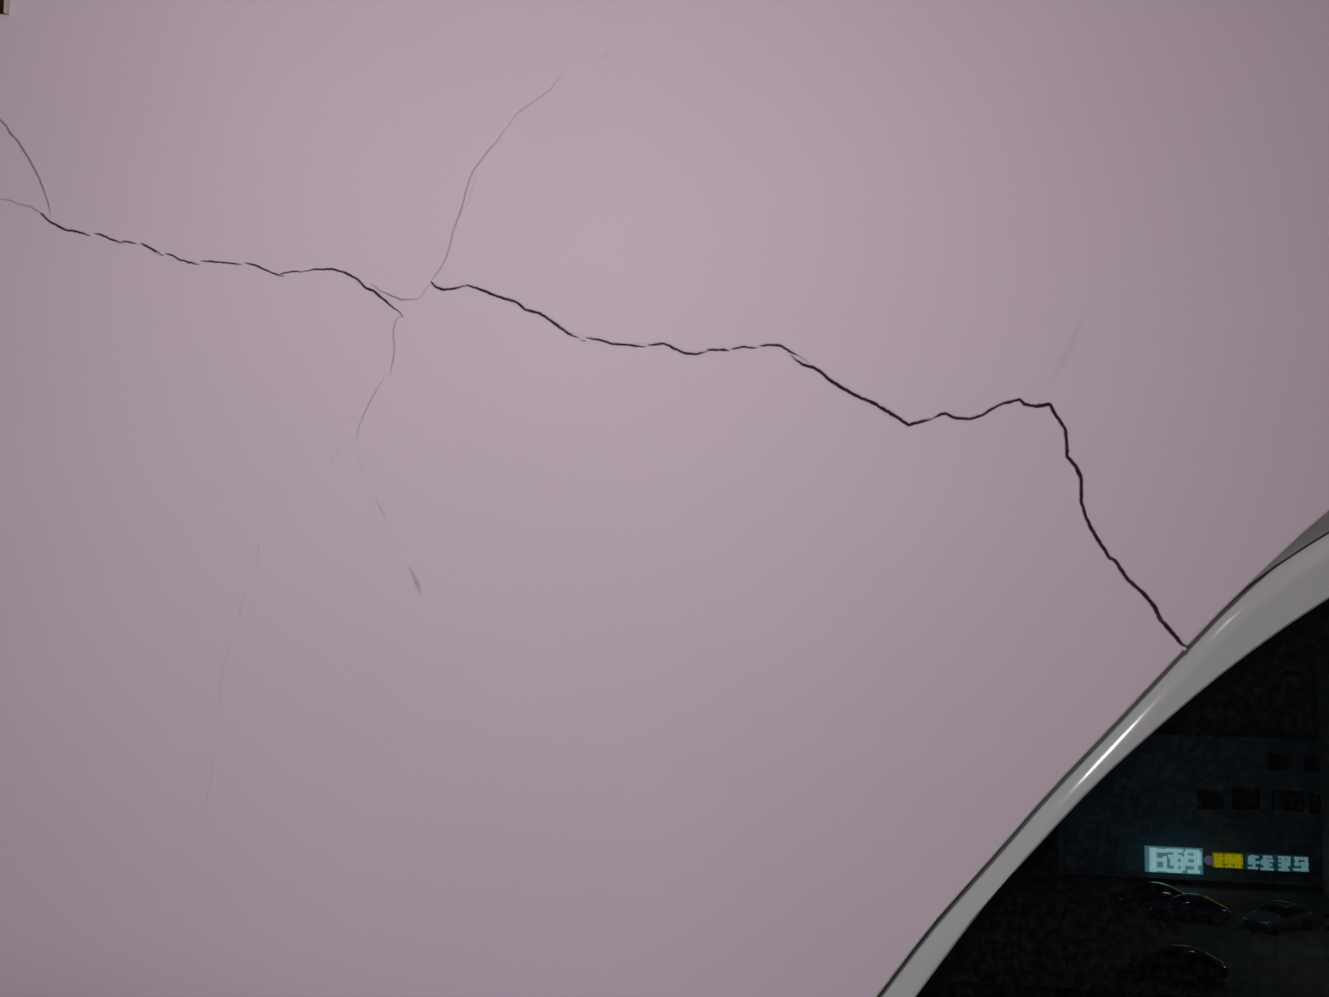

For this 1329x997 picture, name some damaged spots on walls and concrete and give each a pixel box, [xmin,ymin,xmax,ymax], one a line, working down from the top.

crack [39,213,399,315]
crack [428,279,1189,651]